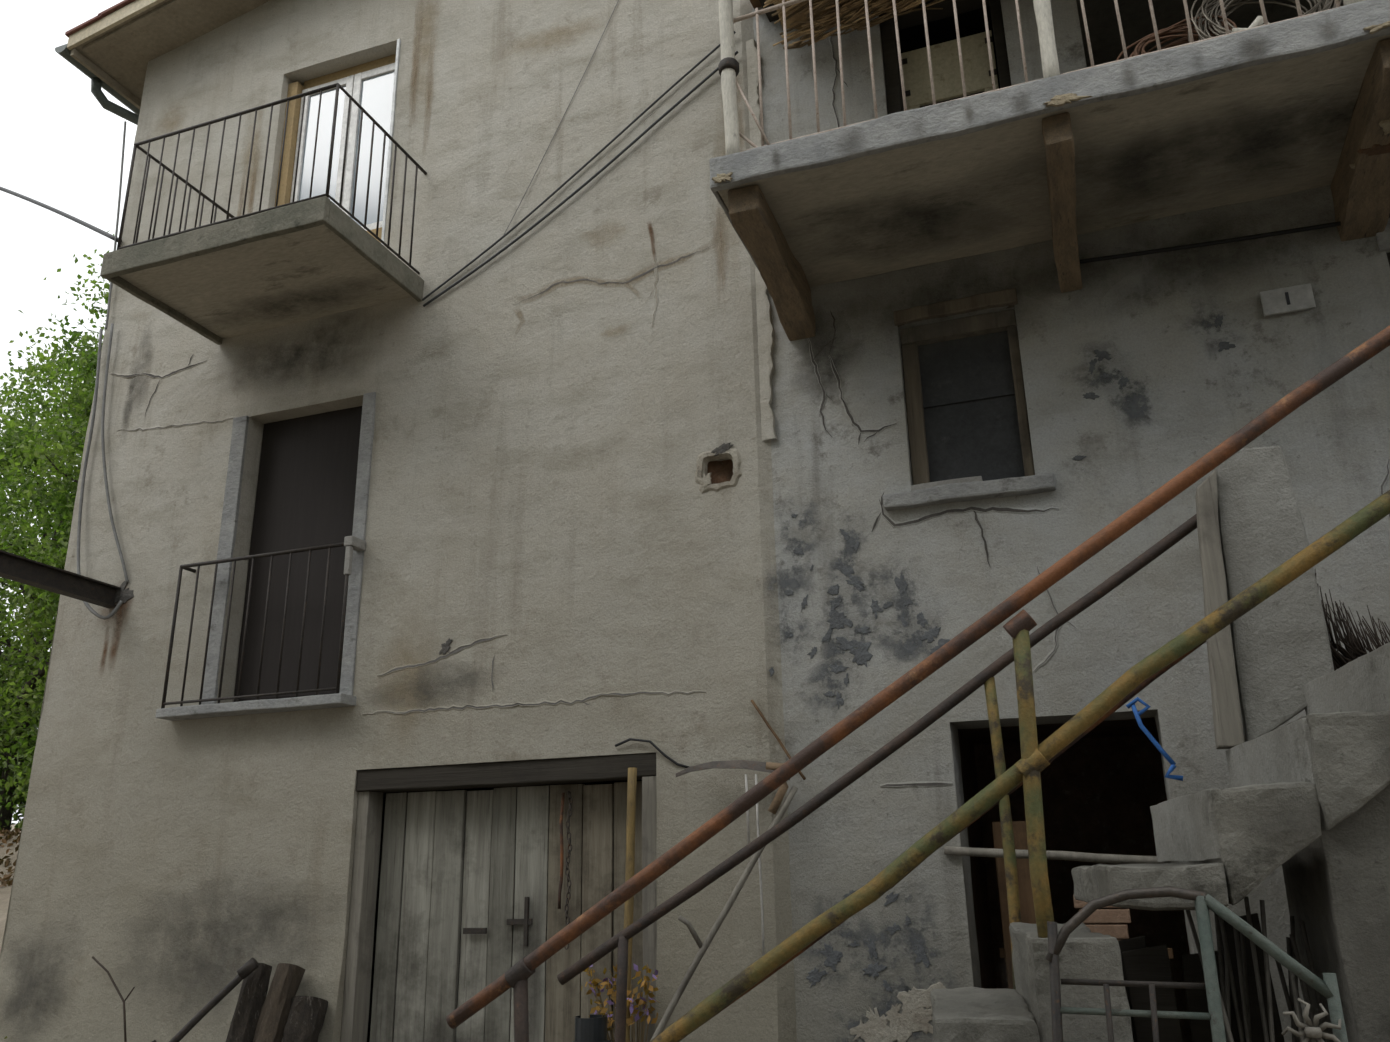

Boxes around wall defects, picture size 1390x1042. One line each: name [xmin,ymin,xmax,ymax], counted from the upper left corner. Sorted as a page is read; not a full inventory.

crack [513,223,715,327]
crack [807,311,897,445]
spalling [694,442,742,494]
crack [872,493,1059,566]